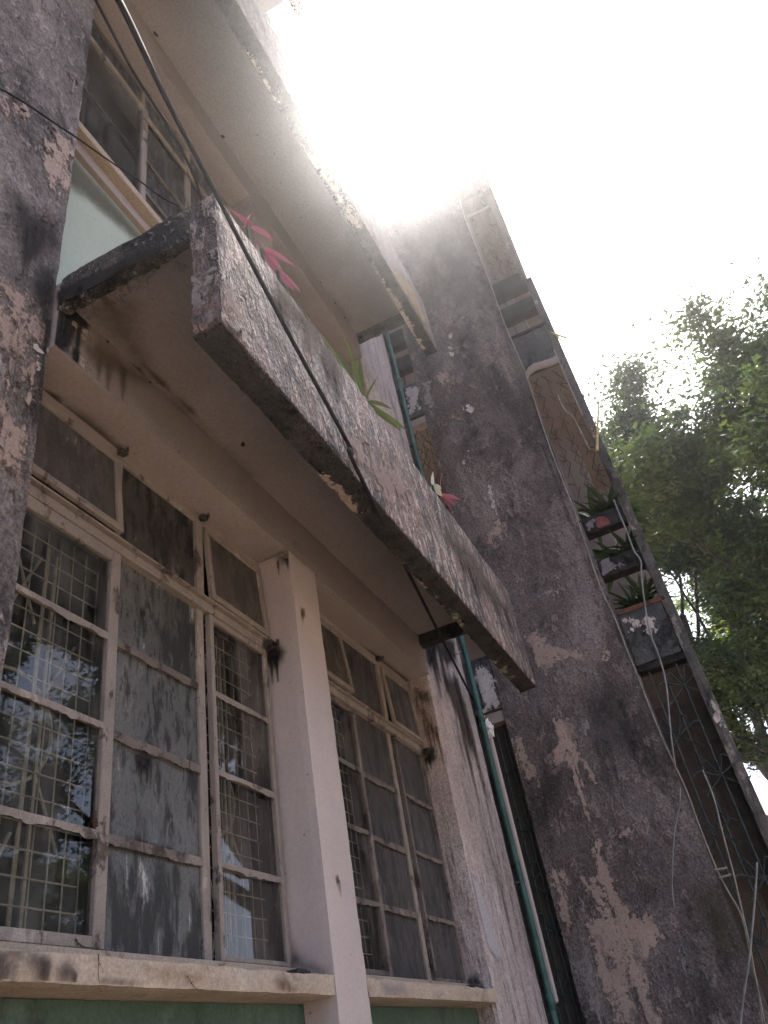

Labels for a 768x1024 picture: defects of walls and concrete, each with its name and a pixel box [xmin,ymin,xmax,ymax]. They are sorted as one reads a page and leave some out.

peeling [0,87,31,125]
peeling [41,127,76,214]
spalling [317,472,363,517]
peeling [340,427,413,519]
leakage [416,640,483,800]
peeling [474,660,516,713]
peeling [523,628,611,674]
peeling [511,736,543,799]
peeling [550,715,600,823]
peeling [549,836,683,1024]